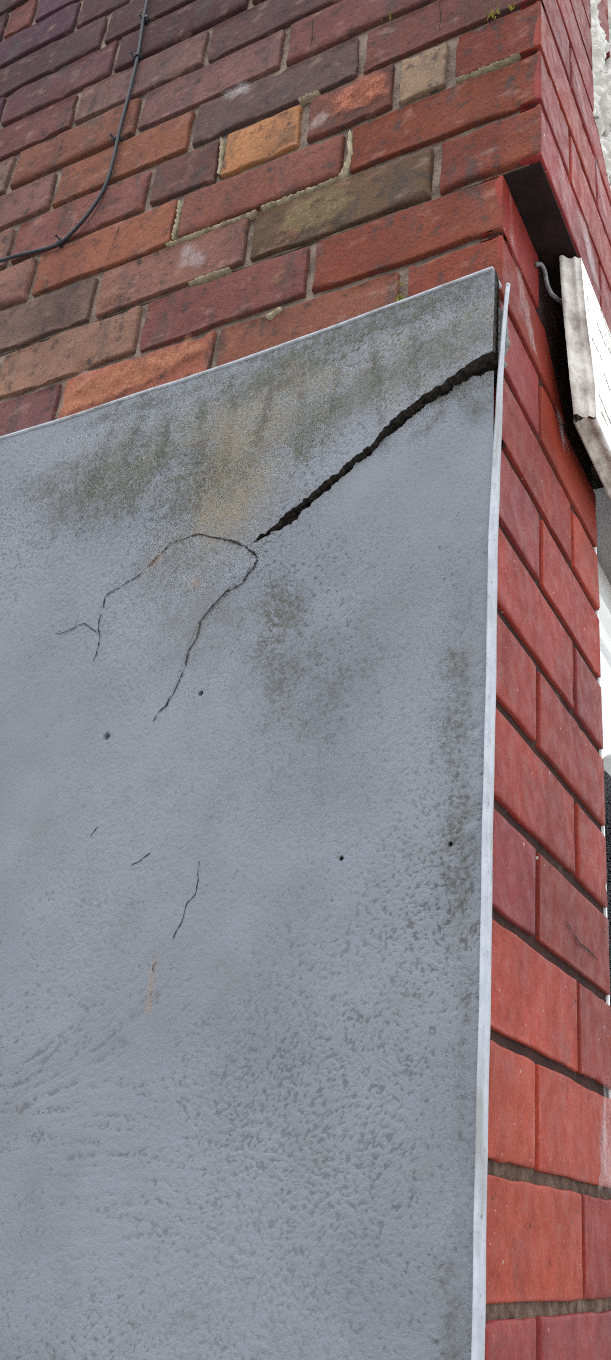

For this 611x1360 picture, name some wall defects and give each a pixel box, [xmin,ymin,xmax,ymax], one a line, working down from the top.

leakage [222,276,493,443]
crack [480,369,498,386]
leakage [43,396,232,523]
crack [56,488,331,721]
leakage [258,583,301,694]